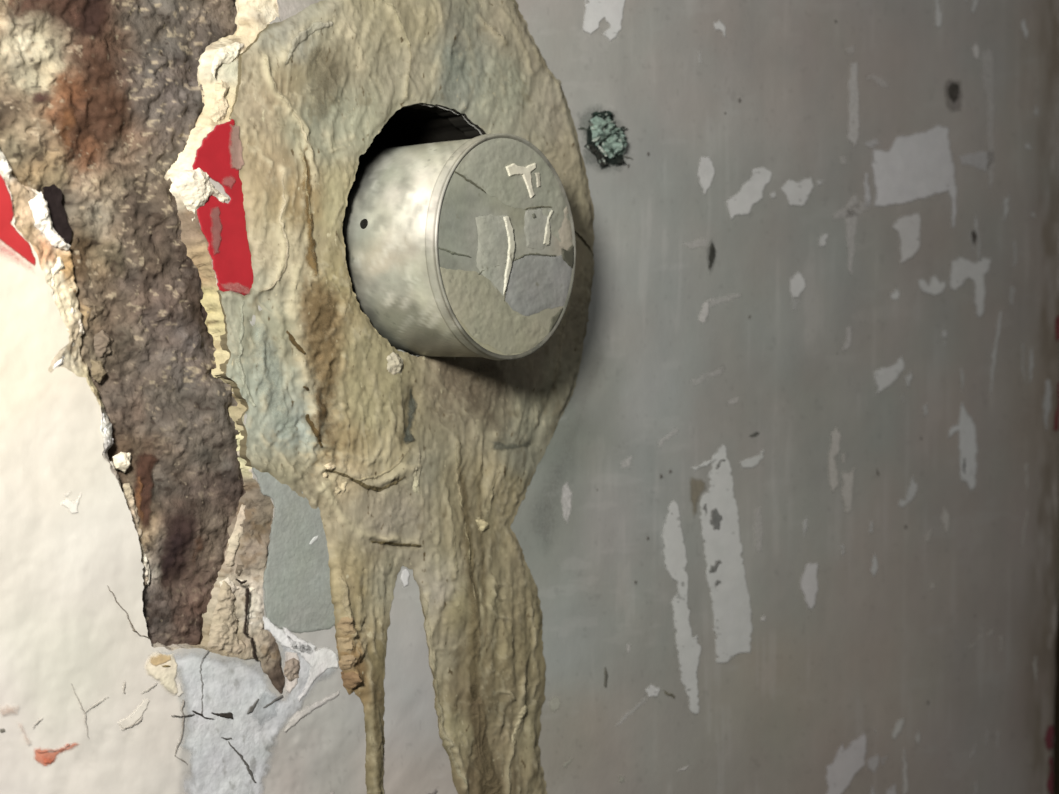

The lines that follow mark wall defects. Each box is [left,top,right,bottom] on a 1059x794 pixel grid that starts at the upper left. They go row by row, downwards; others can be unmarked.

corrosion [9,0,106,34]
peeling [583,0,625,41]
peeling [835,49,994,273]
peeling [918,218,991,317]
spalling [0,0,339,794]
peeling [948,403,978,491]
peeling [646,501,702,714]
peeling [693,445,765,663]
crack [174,650,283,783]
peeling [826,733,886,794]